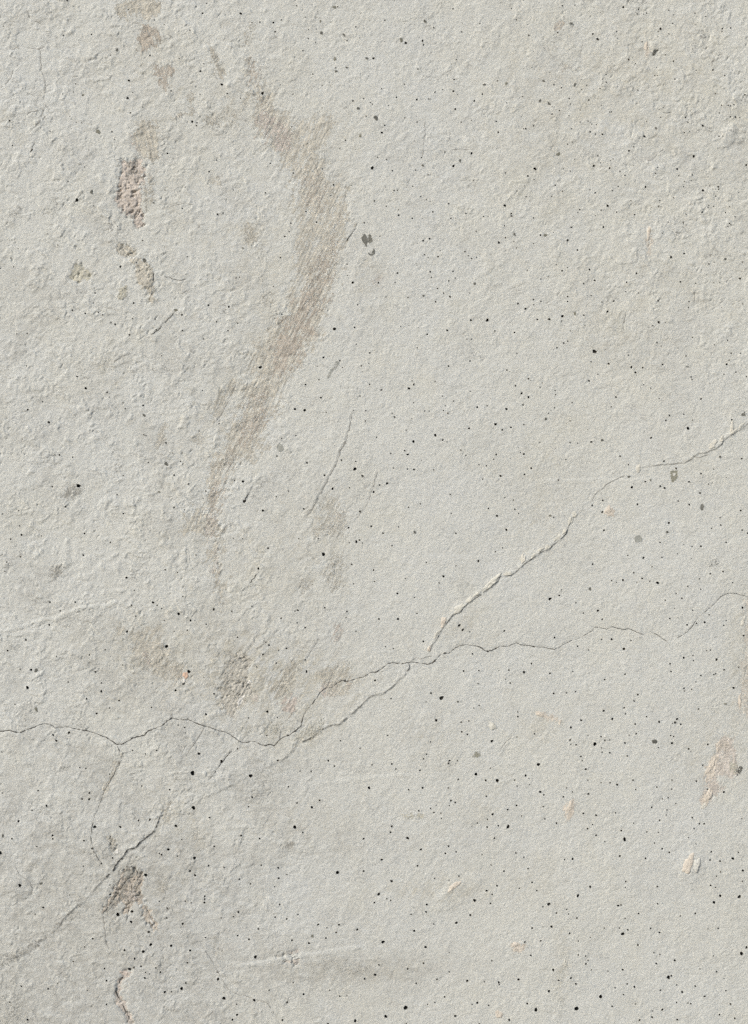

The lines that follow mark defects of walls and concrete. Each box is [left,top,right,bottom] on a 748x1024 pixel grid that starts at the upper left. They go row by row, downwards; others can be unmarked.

spalling [114,158,146,228]
crack [0,420,747,887]